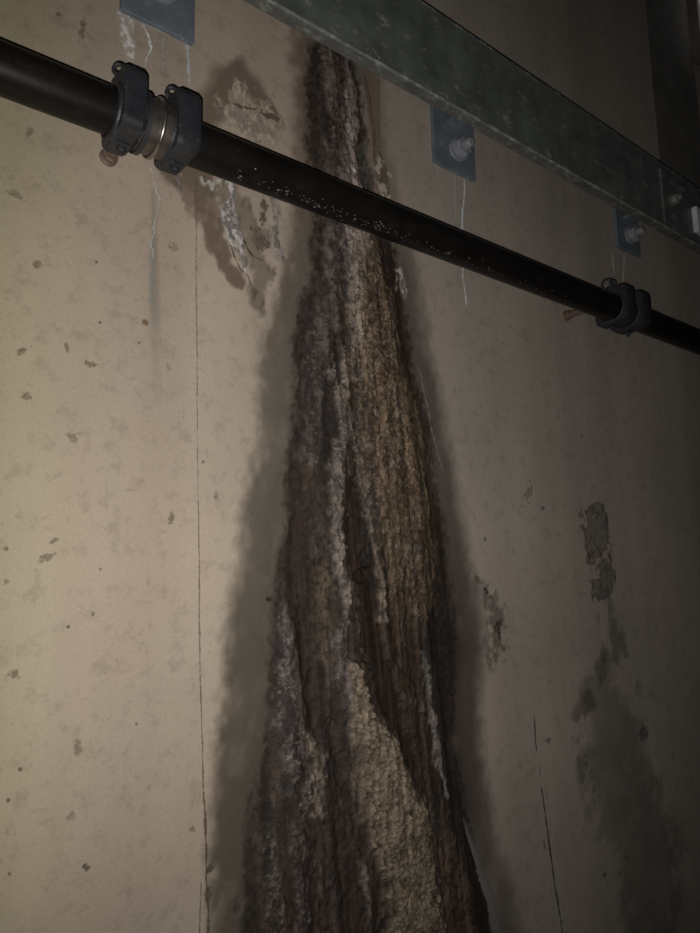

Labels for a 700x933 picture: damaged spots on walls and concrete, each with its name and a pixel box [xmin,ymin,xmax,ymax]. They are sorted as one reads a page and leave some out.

water stain [202,61,285,150]
water stain [297,35,383,198]
water stain [150,166,501,933]
peeling [579,502,616,601]
crack [534,718,563,933]